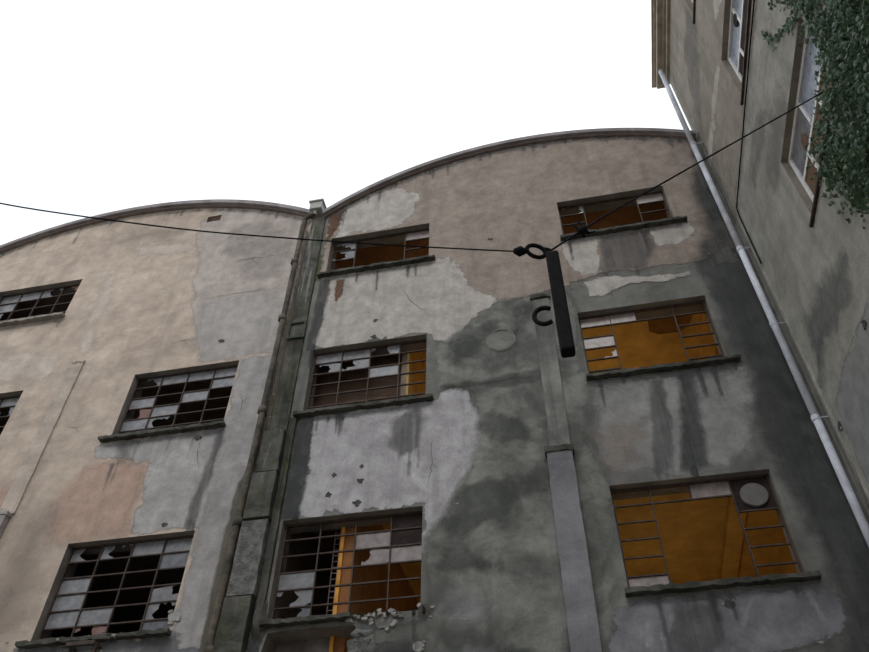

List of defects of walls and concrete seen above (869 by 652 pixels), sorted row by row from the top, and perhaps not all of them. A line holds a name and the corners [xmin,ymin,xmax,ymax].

corrosion [334,279,345,301]
flaking render [299,0,847,652]
leakage [484,372,541,386]
flaking render [0,208,308,652]
leakage [395,405,421,454]
leakage [185,432,222,531]
leakage [447,480,520,532]